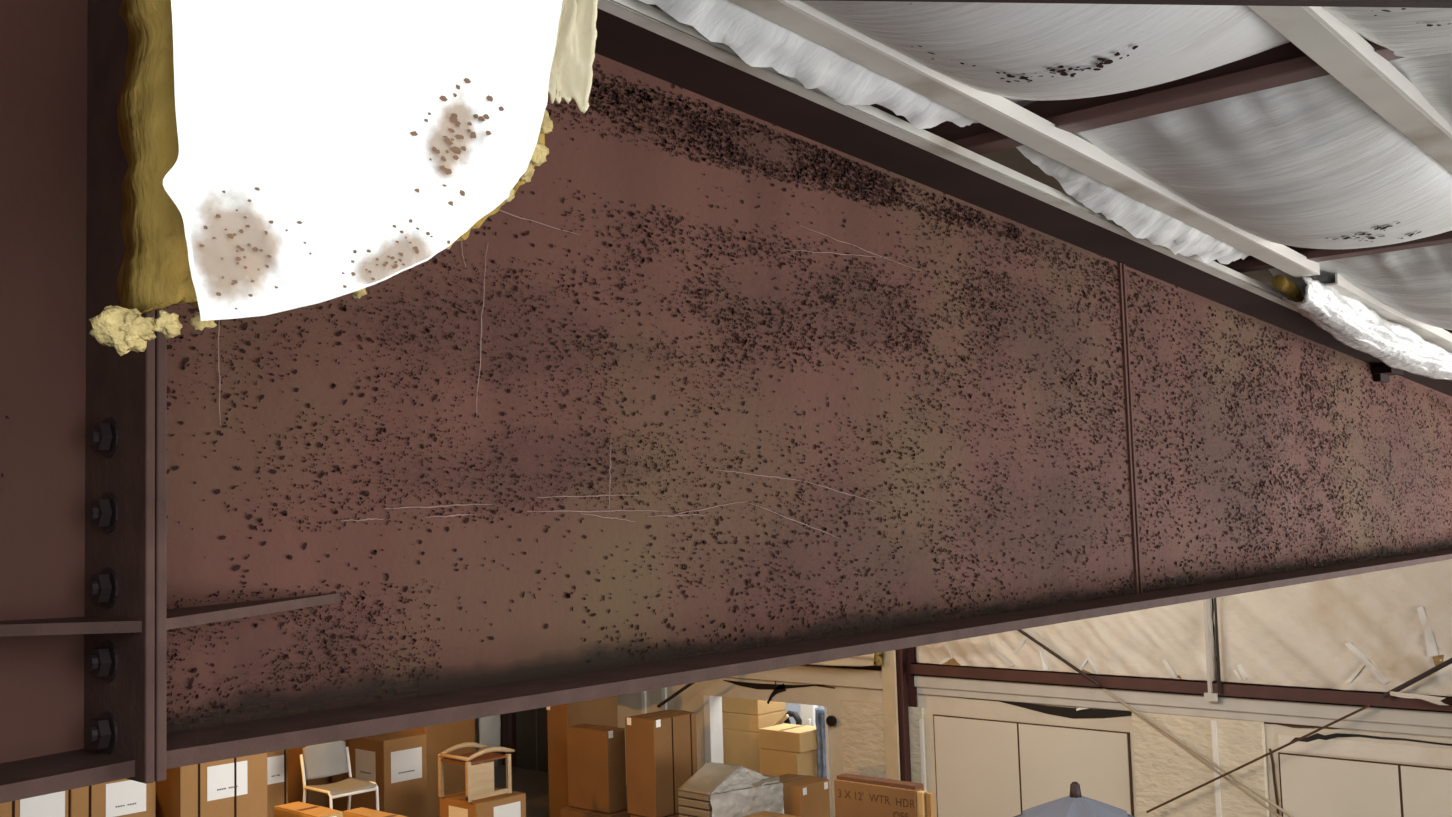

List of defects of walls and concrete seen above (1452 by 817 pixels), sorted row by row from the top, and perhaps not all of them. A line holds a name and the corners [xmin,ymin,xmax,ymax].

mould [996,46,1138,82]
corrosion [167,68,1452,663]
corrosion [166,580,442,724]